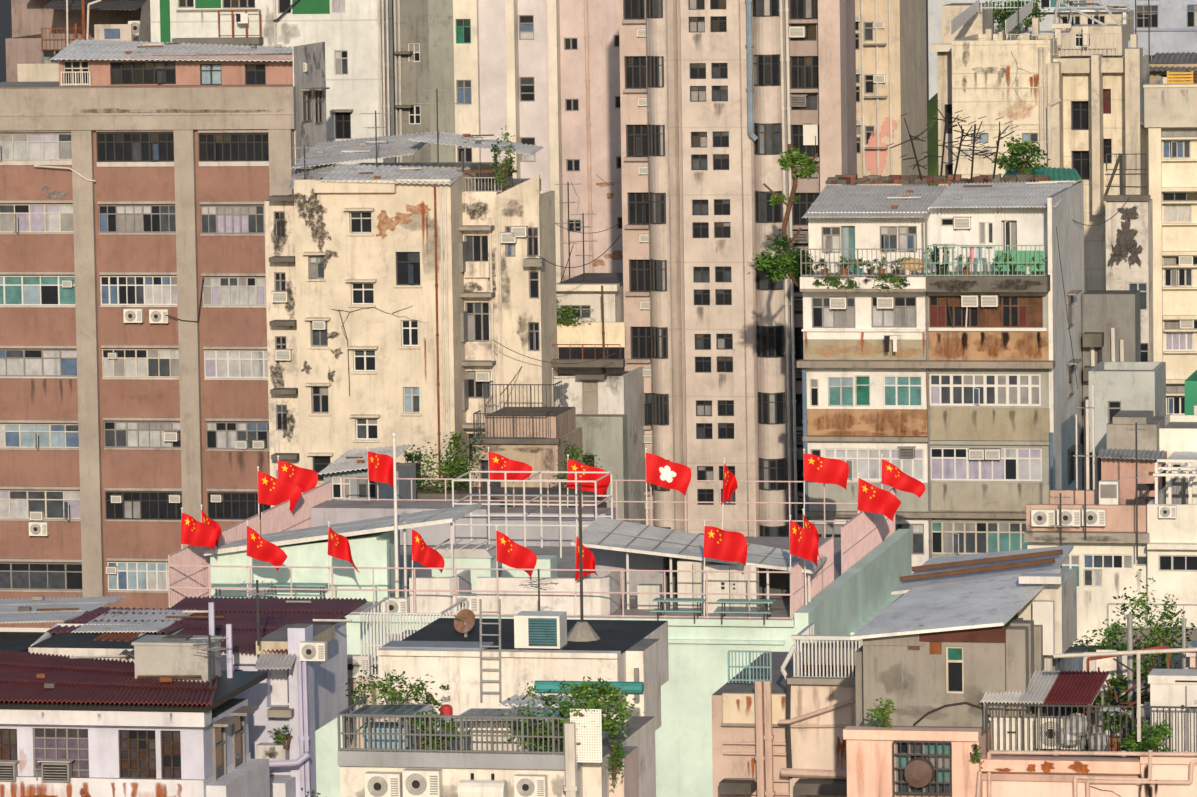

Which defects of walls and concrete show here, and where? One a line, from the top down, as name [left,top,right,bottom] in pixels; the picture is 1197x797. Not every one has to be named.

spalling [292,189,337,269]
peeling [375,203,431,239]
spalling [1107,206,1143,269]
water stain [962,332,985,349]
corrosion [1027,761,1090,774]
corrosion [0,783,88,797]
corrosion [112,783,138,797]
corrosion [156,784,182,797]